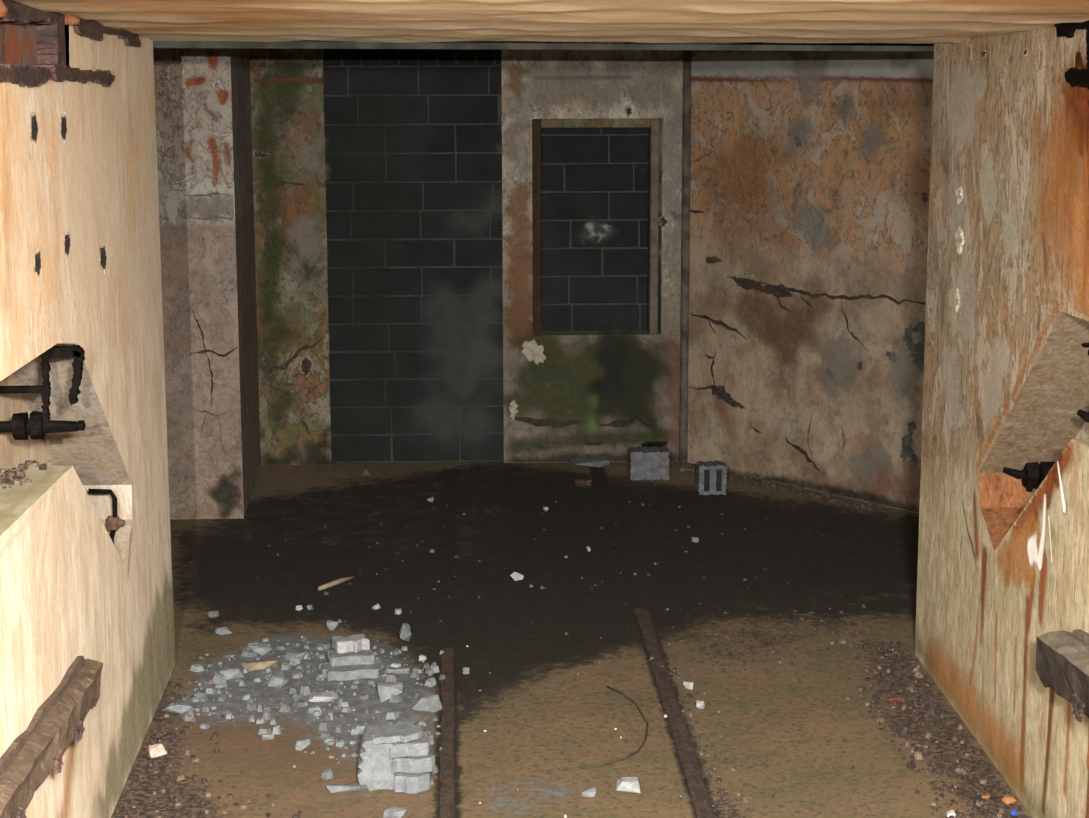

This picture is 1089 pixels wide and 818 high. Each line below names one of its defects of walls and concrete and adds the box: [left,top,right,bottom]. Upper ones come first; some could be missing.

rust [186,51,217,85]
rust [209,137,230,181]
water stain [590,332,656,430]
crack [689,314,821,471]
crack [726,276,926,352]
peeling [903,322,925,372]
water stain [266,435,332,465]
peeling [900,420,919,471]
rust [970,445,1072,786]
rust [1042,687,1054,812]